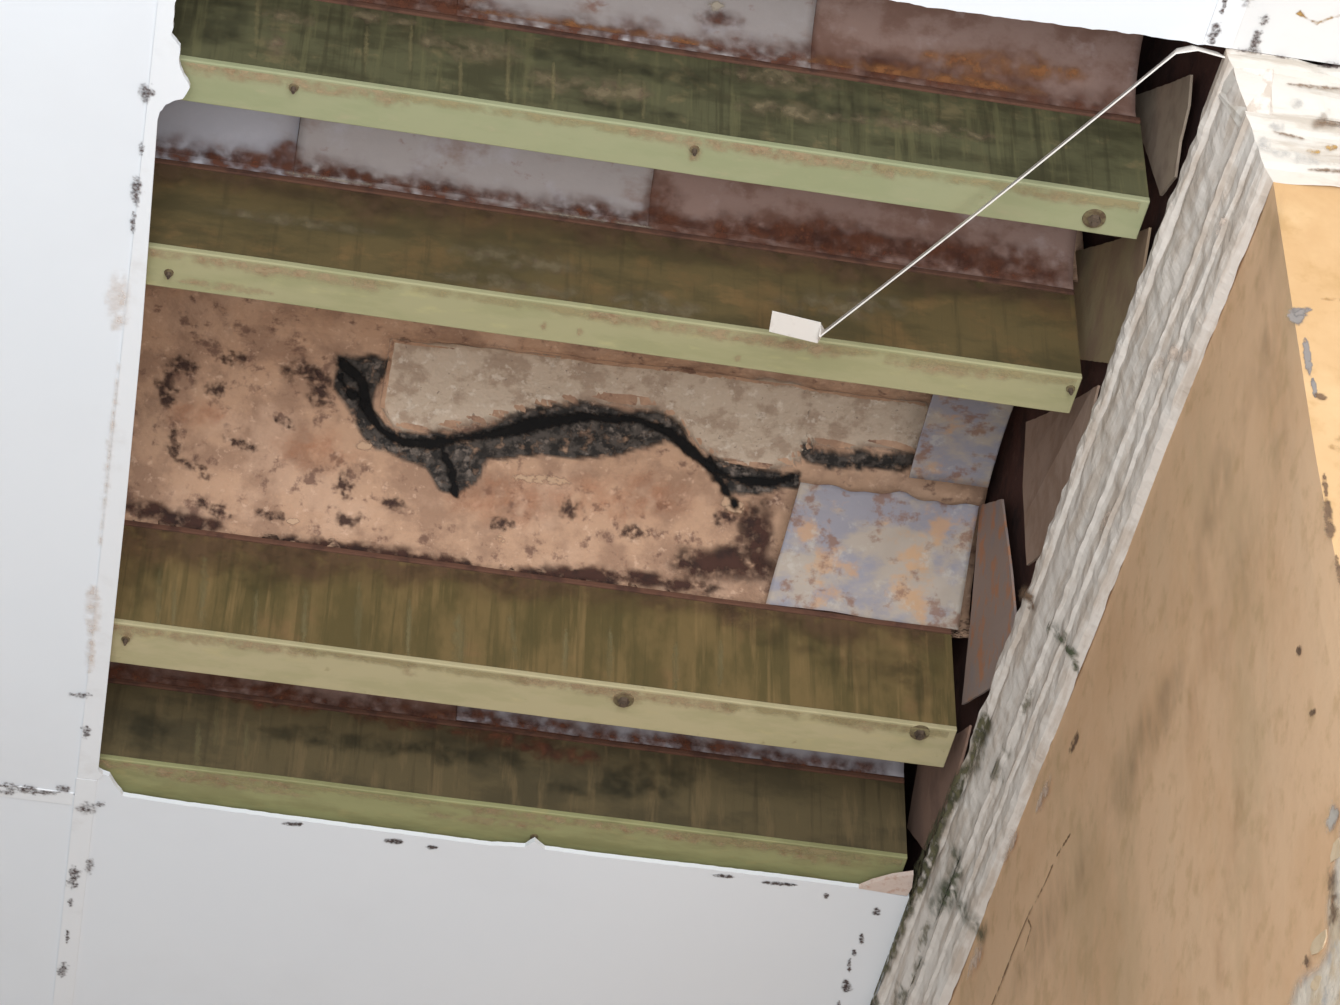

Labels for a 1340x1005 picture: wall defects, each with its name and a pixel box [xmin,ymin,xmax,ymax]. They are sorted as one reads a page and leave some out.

corrosion [354,0,947,134]
corrosion [156,141,1057,286]
spalling [158,356,196,407]
crack [336,358,795,509]
spalling [283,339,928,524]
corrosion [126,502,222,531]
spalling [338,515,360,526]
corrosion [268,536,462,564]
corrosion [518,507,774,593]
water stain [838,934,864,1005]
water stain [870,714,1003,1005]
peeling [1291,805,1340,1005]